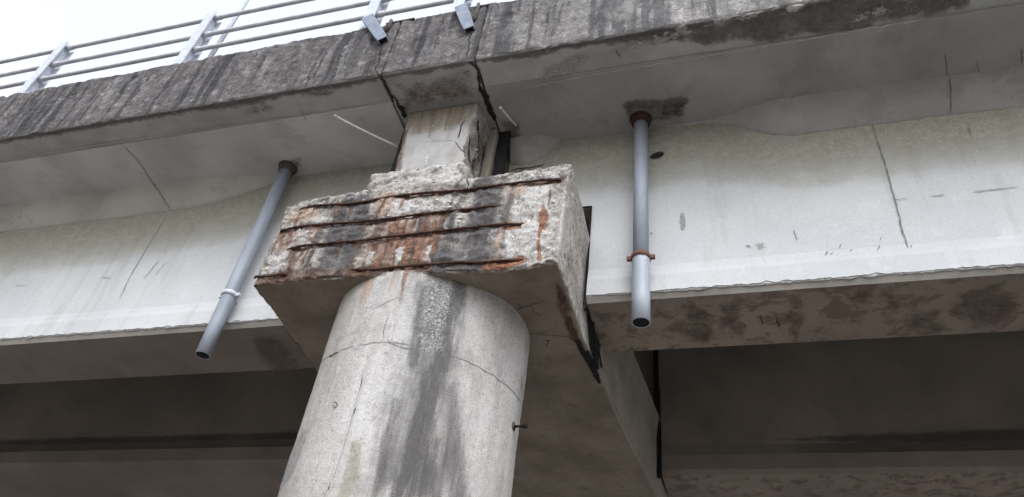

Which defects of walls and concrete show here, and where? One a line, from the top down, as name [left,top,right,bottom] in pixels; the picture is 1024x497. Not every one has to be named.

leakage [593,0,969,45]
leakage [3,28,376,143]
leakage [0,80,514,497]
crack [374,44,407,118]
corrosion [256,181,561,304]
spalling [254,166,569,279]
crack [422,31,496,194]
leakage [518,132,634,172]
leakage [624,98,1024,170]
crack [872,125,908,247]
crack [322,293,522,496]
leakage [575,314,602,384]